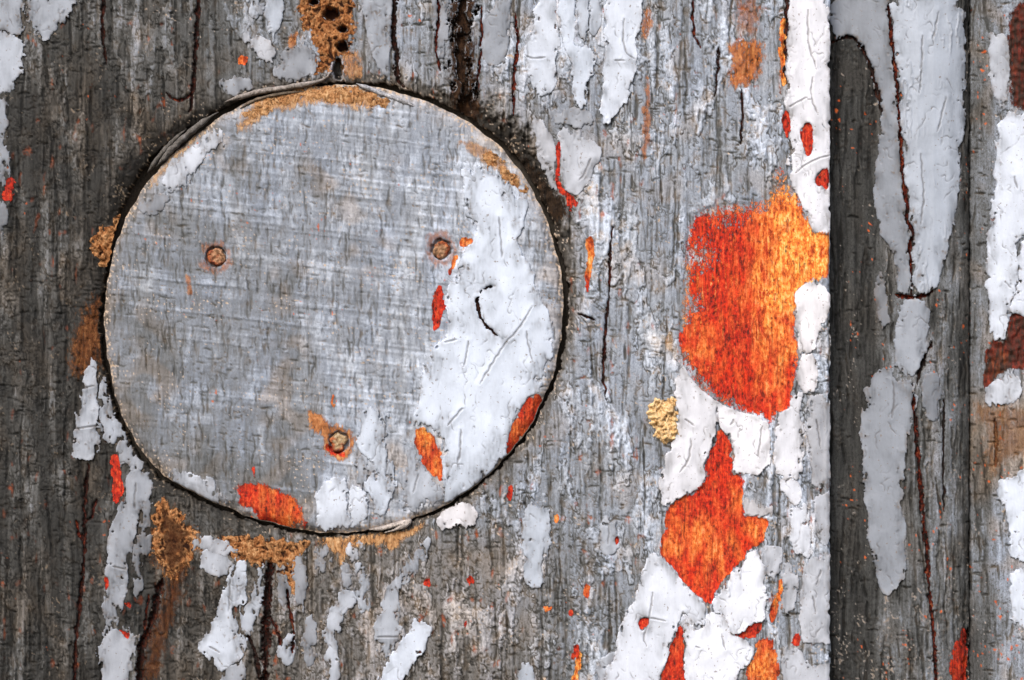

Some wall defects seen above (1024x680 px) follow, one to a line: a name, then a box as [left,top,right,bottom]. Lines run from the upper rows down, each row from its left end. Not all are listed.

peeling [361,0,396,81]
peeling [431,0,451,59]
peeling [478,0,515,66]
peeling [522,0,643,211]
peeling [983,2,1024,407]
peeling [71,357,154,680]
corrosion [308,410,357,461]
peeling [168,165,559,680]
peeling [594,0,969,680]
peeling [571,644,582,680]